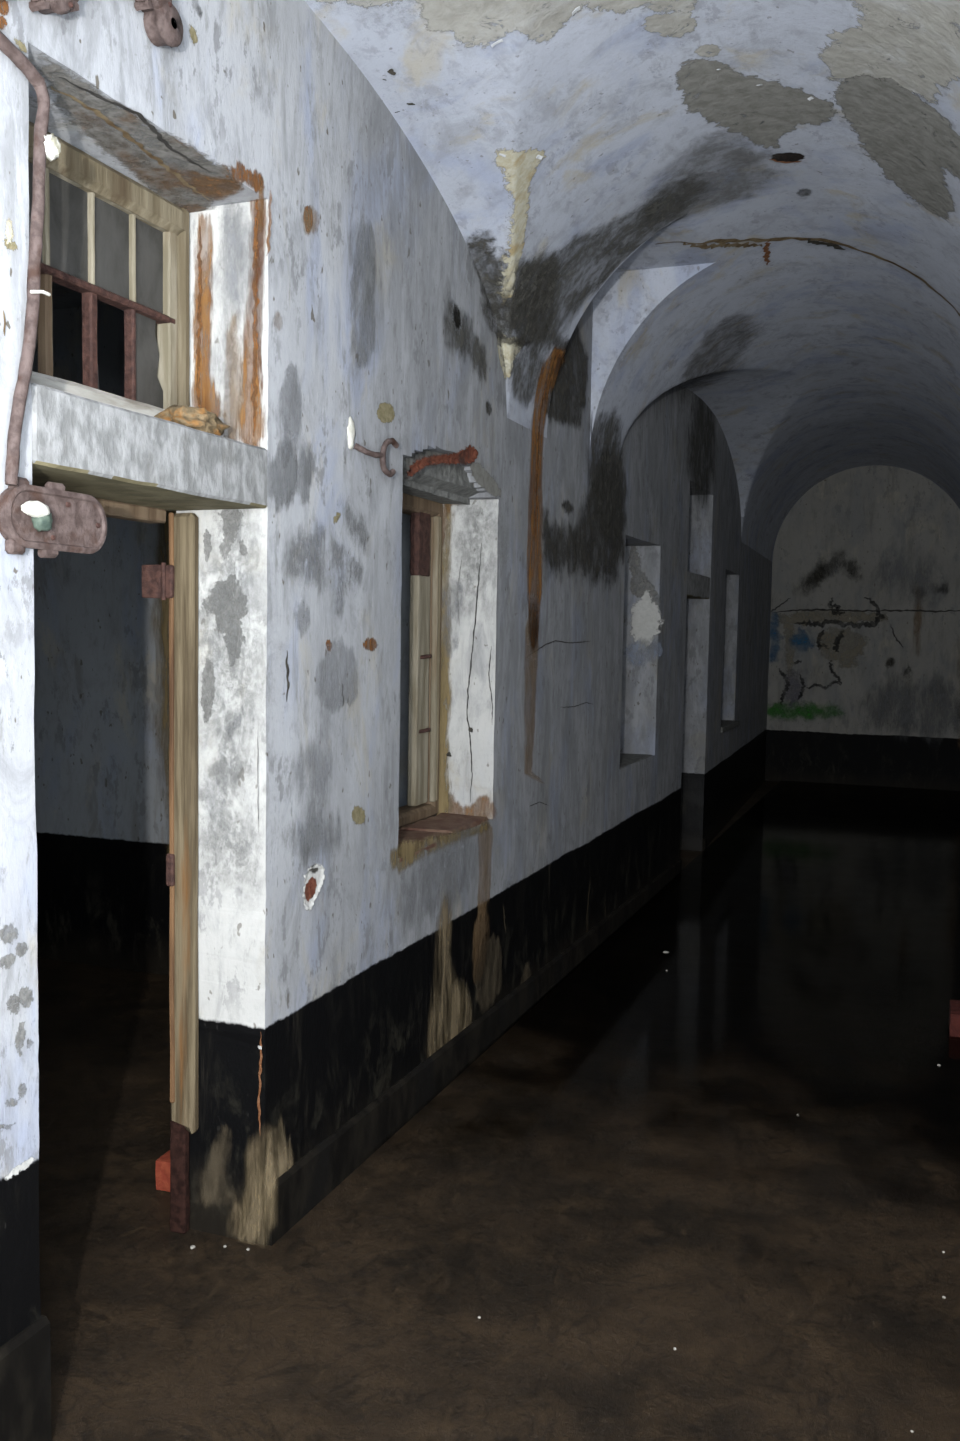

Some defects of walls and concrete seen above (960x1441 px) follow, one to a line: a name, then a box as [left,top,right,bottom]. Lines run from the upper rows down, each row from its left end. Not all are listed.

peeling [317,0,697,48]
peeling [675,0,960,220]
rust [0,0,272,446]
peeling [495,147,546,304]
damp [445,148,763,583]
crack [658,237,960,316]
rust [525,347,565,779]
crack [771,598,960,647]